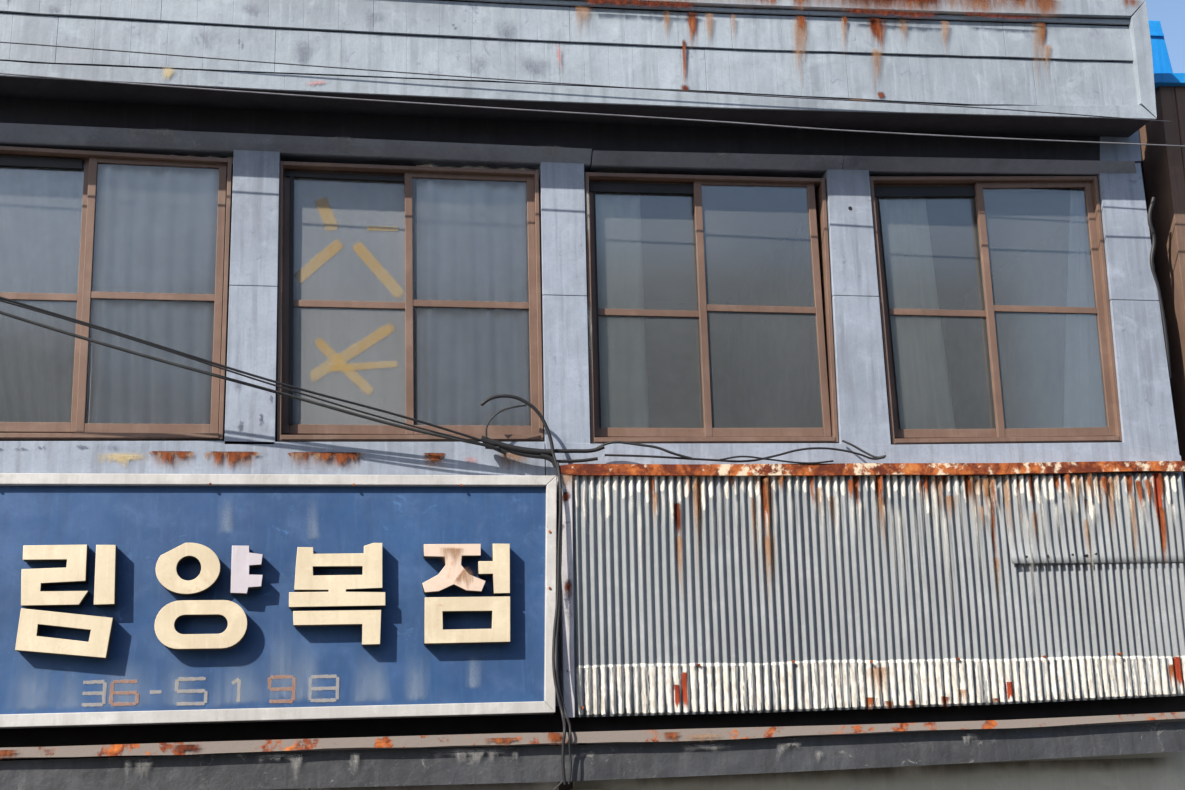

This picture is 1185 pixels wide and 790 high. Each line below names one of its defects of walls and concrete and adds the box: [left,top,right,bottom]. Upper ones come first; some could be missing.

corrosion [577,0,712,91]
corrosion [831,0,1053,65]
corrosion [149,451,259,465]
corrosion [288,452,363,465]
corrosion [687,476,700,533]
corrosion [754,475,784,566]
corrosion [874,475,885,518]
corrosion [919,475,1037,581]
corrosion [1054,473,1166,552]
corrosion [673,672,688,707]
corrosion [993,682,1013,702]
corrosion [1169,657,1183,690]